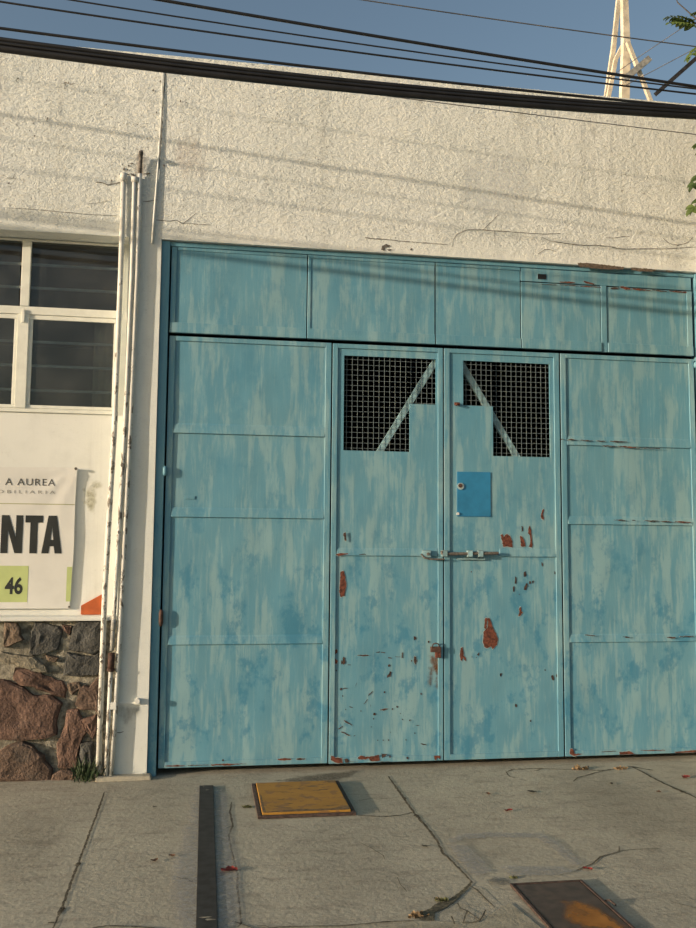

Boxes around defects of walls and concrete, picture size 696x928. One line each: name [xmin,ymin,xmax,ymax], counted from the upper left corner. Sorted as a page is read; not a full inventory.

crack [365,216,693,254]
crack [506,766,696,798]
crack [48,792,105,928]
crack [225,802,414,928]
crack [358,777,495,924]
crack [571,846,659,872]
crack [92,920,155,928]